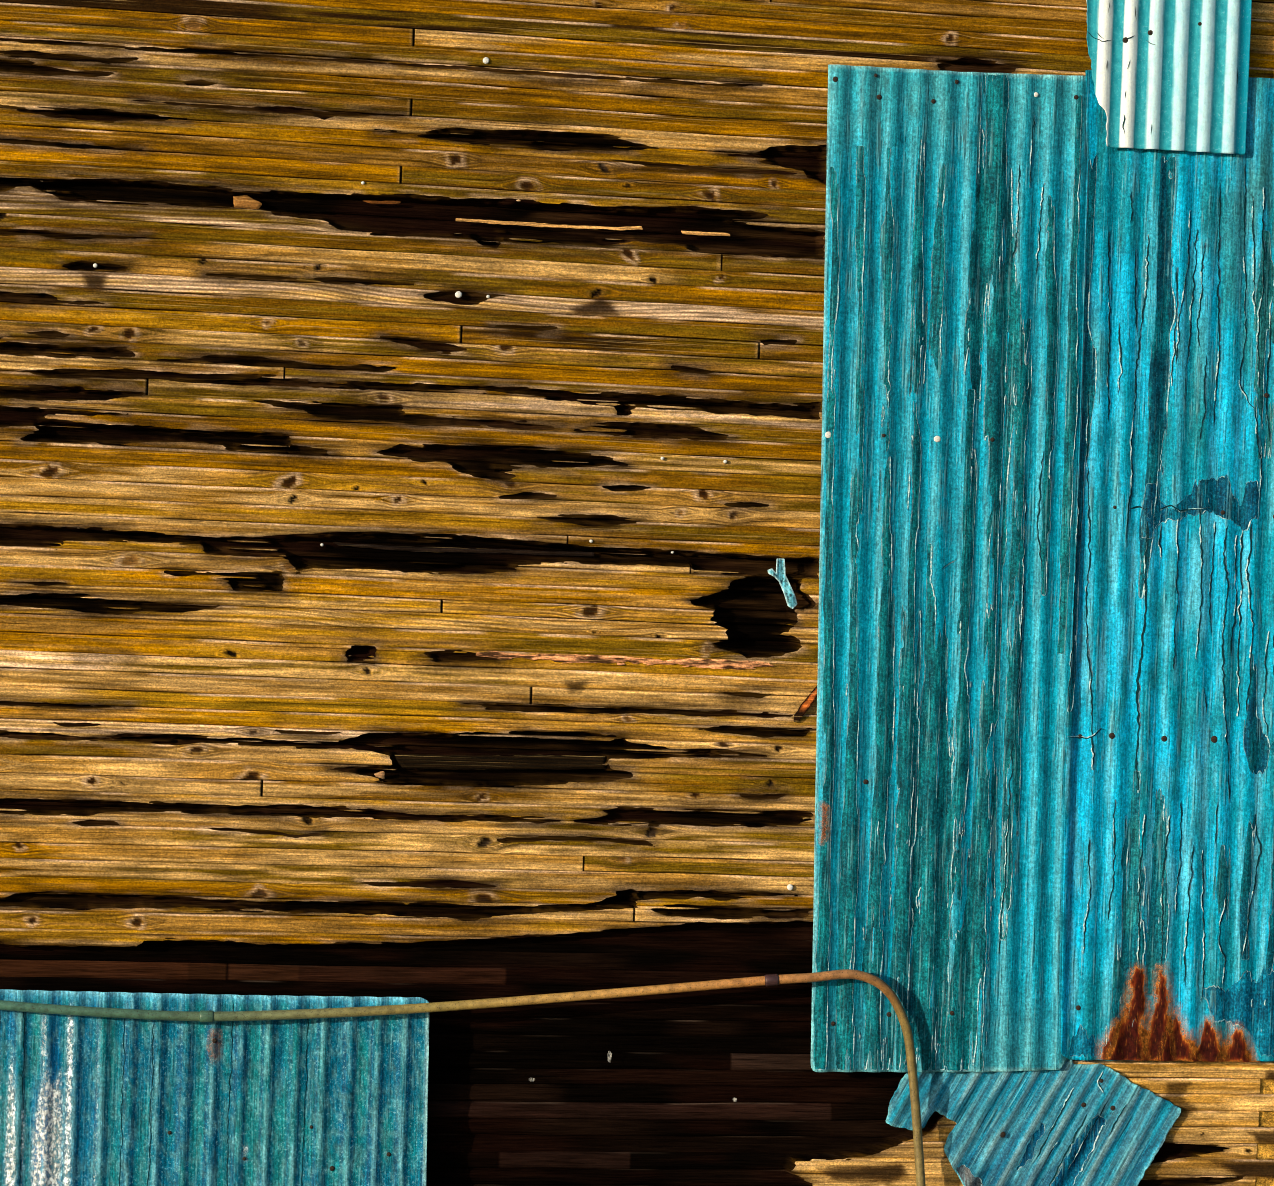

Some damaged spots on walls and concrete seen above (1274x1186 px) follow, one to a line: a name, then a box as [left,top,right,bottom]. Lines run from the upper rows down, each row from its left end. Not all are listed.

crack [1012,115,1045,274]
peeling [1138,156,1259,599]
crack [1017,452,1044,706]
crack [1067,166,1274,999]
peeling [1243,654,1274,774]
crack [998,739,1013,951]
peeling [1069,771,1169,1057]
corrosion [1100,967,1253,1062]
peeling [1203,814,1274,1058]